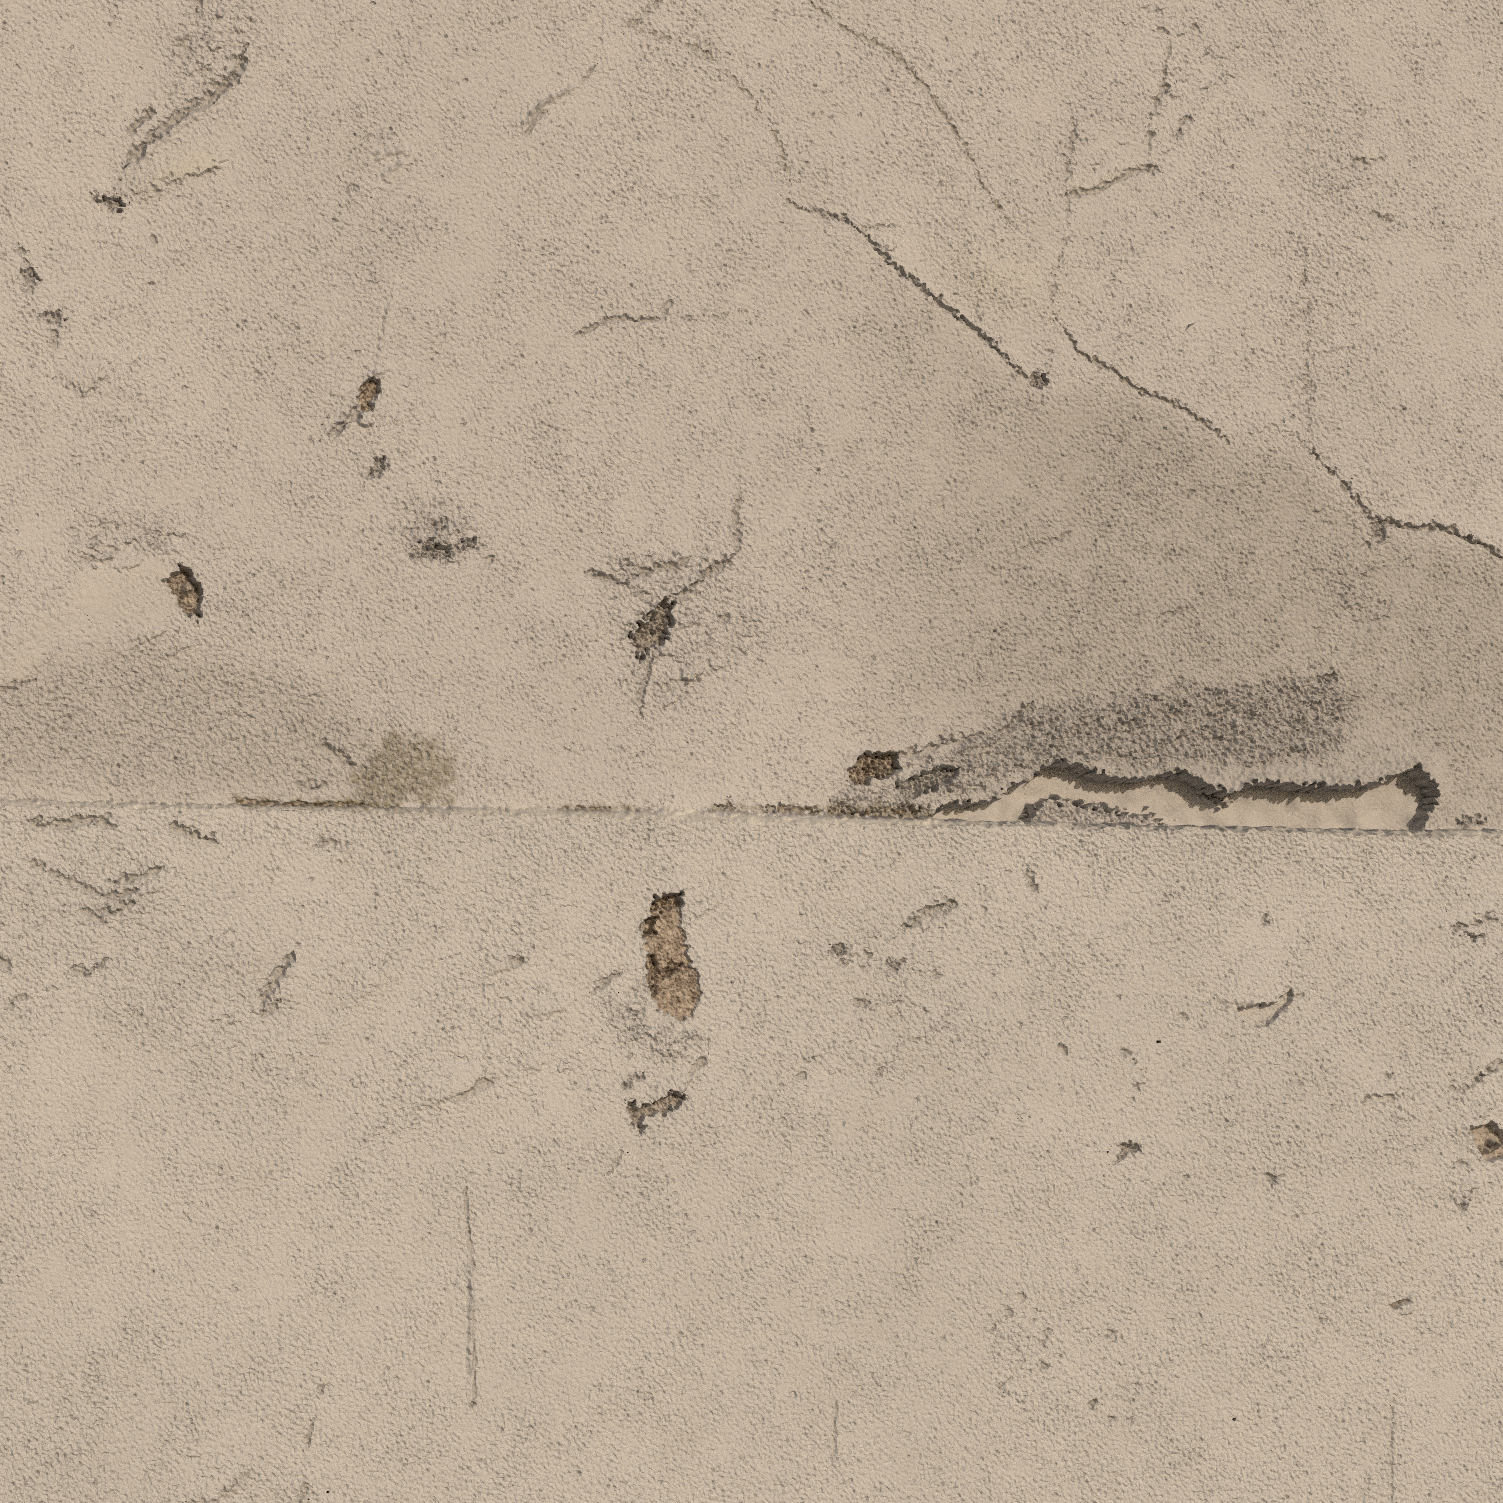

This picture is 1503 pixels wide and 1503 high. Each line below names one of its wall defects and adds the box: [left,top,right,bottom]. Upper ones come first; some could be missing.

crack [515,63,599,141]
crack [568,296,772,340]
crack [622,0,1503,564]
peeling [60,493,209,663]
hole [567,489,803,757]
spalling [1013,529,1075,556]
spalling [819,576,1503,831]
spalling [480,940,529,979]
spalling [518,869,729,1181]
hole [1447,1099,1503,1215]